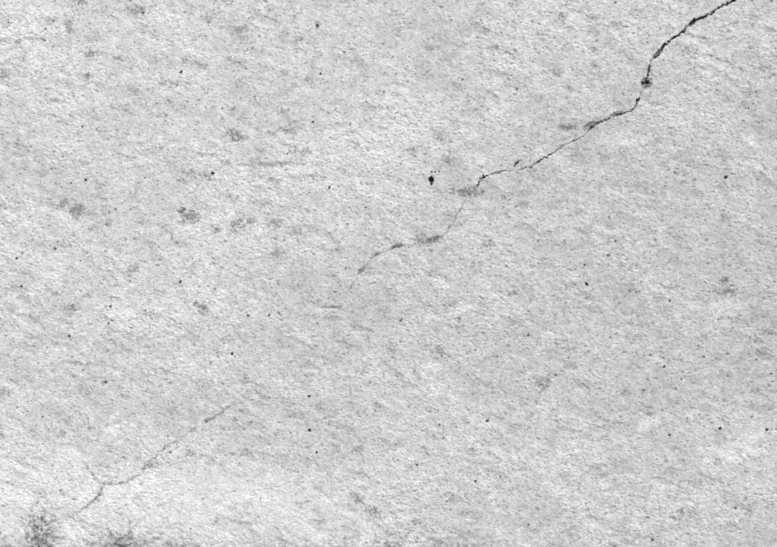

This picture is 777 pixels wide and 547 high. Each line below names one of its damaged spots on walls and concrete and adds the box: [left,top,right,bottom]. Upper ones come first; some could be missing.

crack [562,0,735,130]
crack [358,161,519,273]